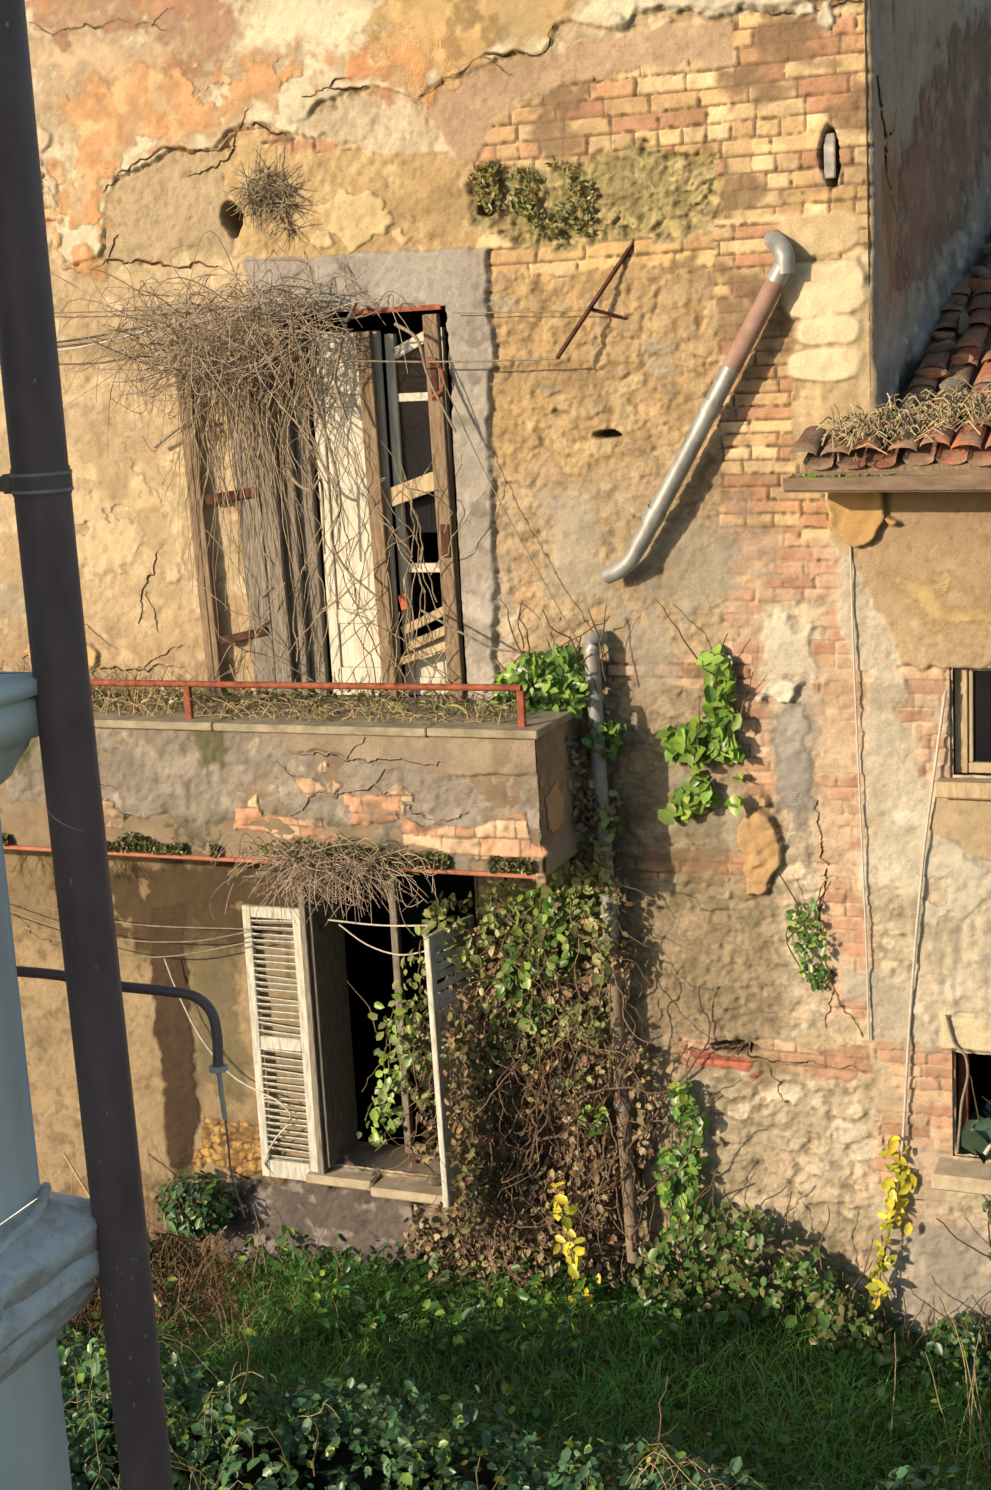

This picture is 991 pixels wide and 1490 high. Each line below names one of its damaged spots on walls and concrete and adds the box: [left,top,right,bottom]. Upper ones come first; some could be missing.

crack [302,77,366,97]
peeling [326,0,579,107]
crack [419,25,554,97]
peeling [609,0,841,31]
peeling [28,0,302,281]
crack [101,109,286,195]
crack [62,235,221,274]
peeling [311,188,410,255]
peeling [826,492,898,548]
crack [84,549,184,673]
flaking render [233,761,586,885]
water stain [110,858,323,1169]